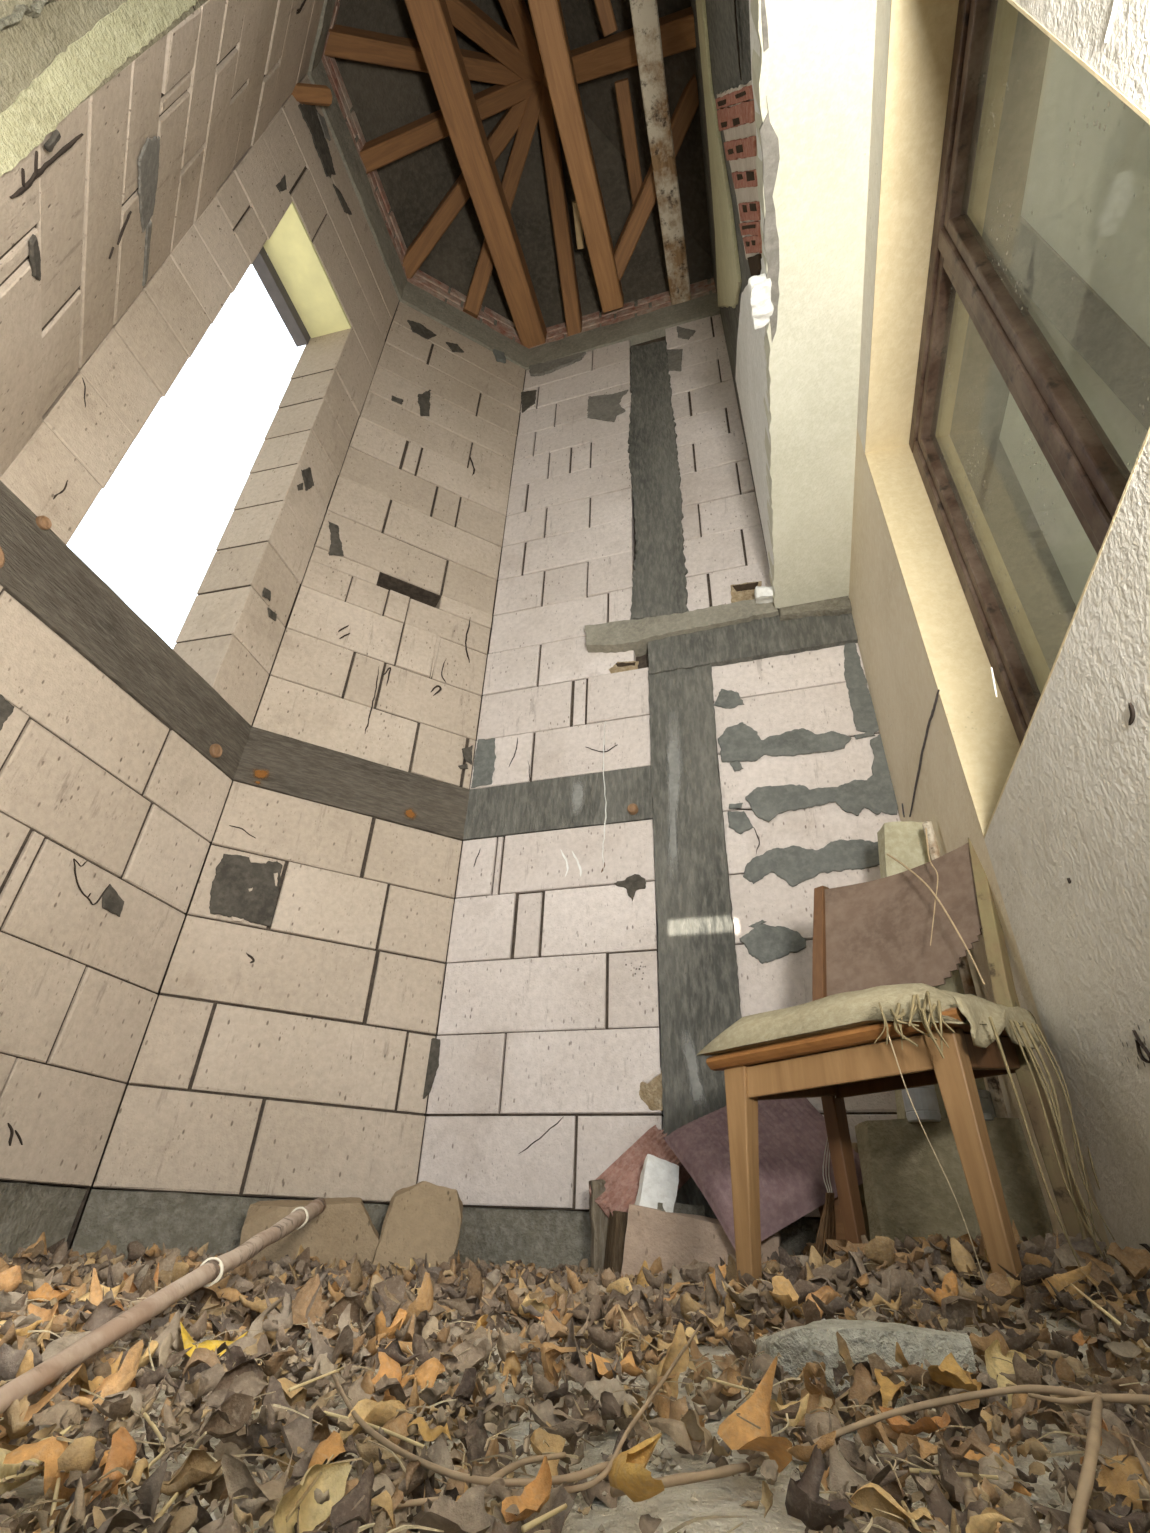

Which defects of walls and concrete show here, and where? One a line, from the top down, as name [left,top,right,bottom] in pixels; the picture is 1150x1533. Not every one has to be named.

peeling [249,855,278,886]